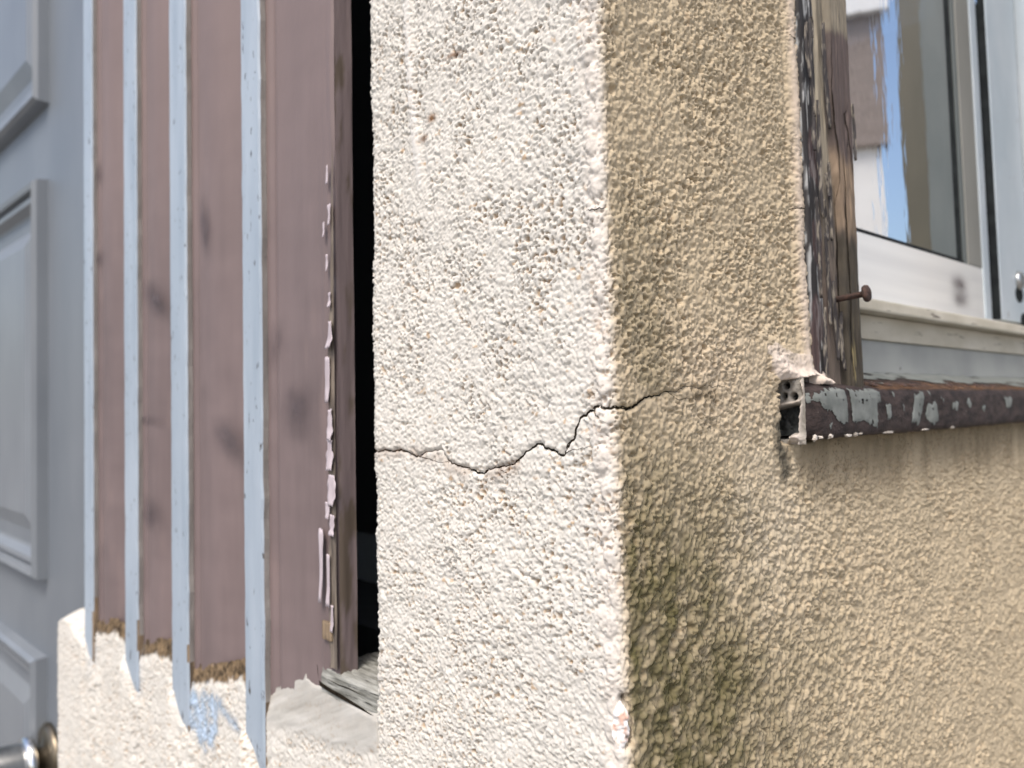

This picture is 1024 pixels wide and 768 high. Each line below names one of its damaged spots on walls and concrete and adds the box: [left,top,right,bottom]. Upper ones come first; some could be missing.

peeling [318,153,337,670]
crack [378,385,725,475]
peeling [767,16,1024,446]